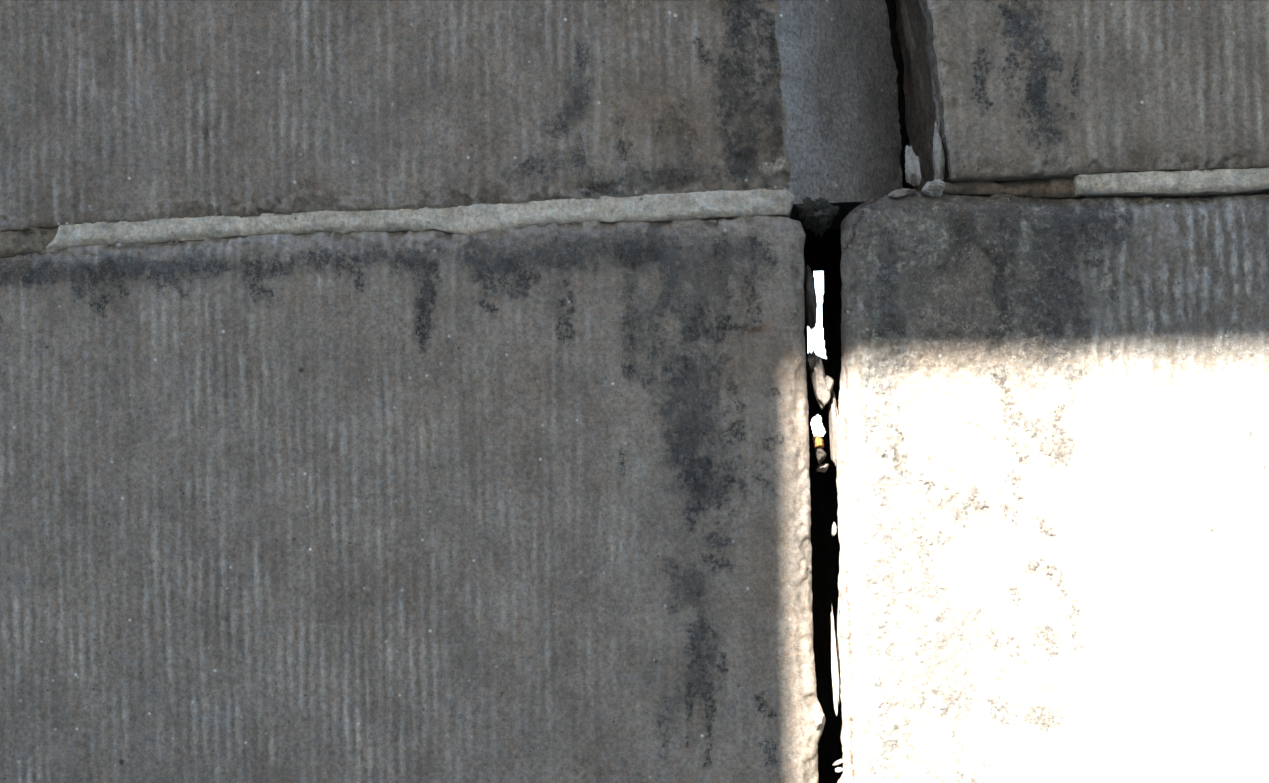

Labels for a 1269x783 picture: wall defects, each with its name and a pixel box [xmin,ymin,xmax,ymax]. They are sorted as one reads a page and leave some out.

leakage [548,0,785,197]
leakage [972,48,993,109]
leakage [1000,0,1082,137]
leakage [0,254,295,317]
leakage [681,233,762,344]
leakage [464,237,743,531]
leakage [863,195,1177,783]
leakage [658,617,728,768]